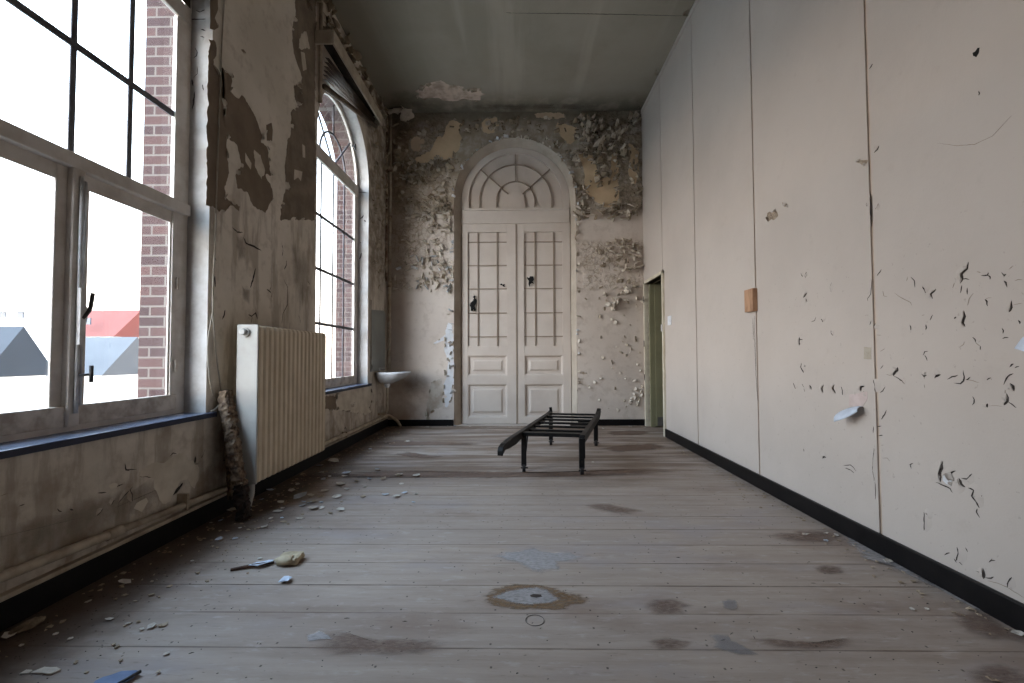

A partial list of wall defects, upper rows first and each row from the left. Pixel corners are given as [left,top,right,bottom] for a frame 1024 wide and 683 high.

peeling [206,0,645,420]
flaking render [766,202,788,222]
peeling [834,391,867,422]
peeling [134,451,199,512]